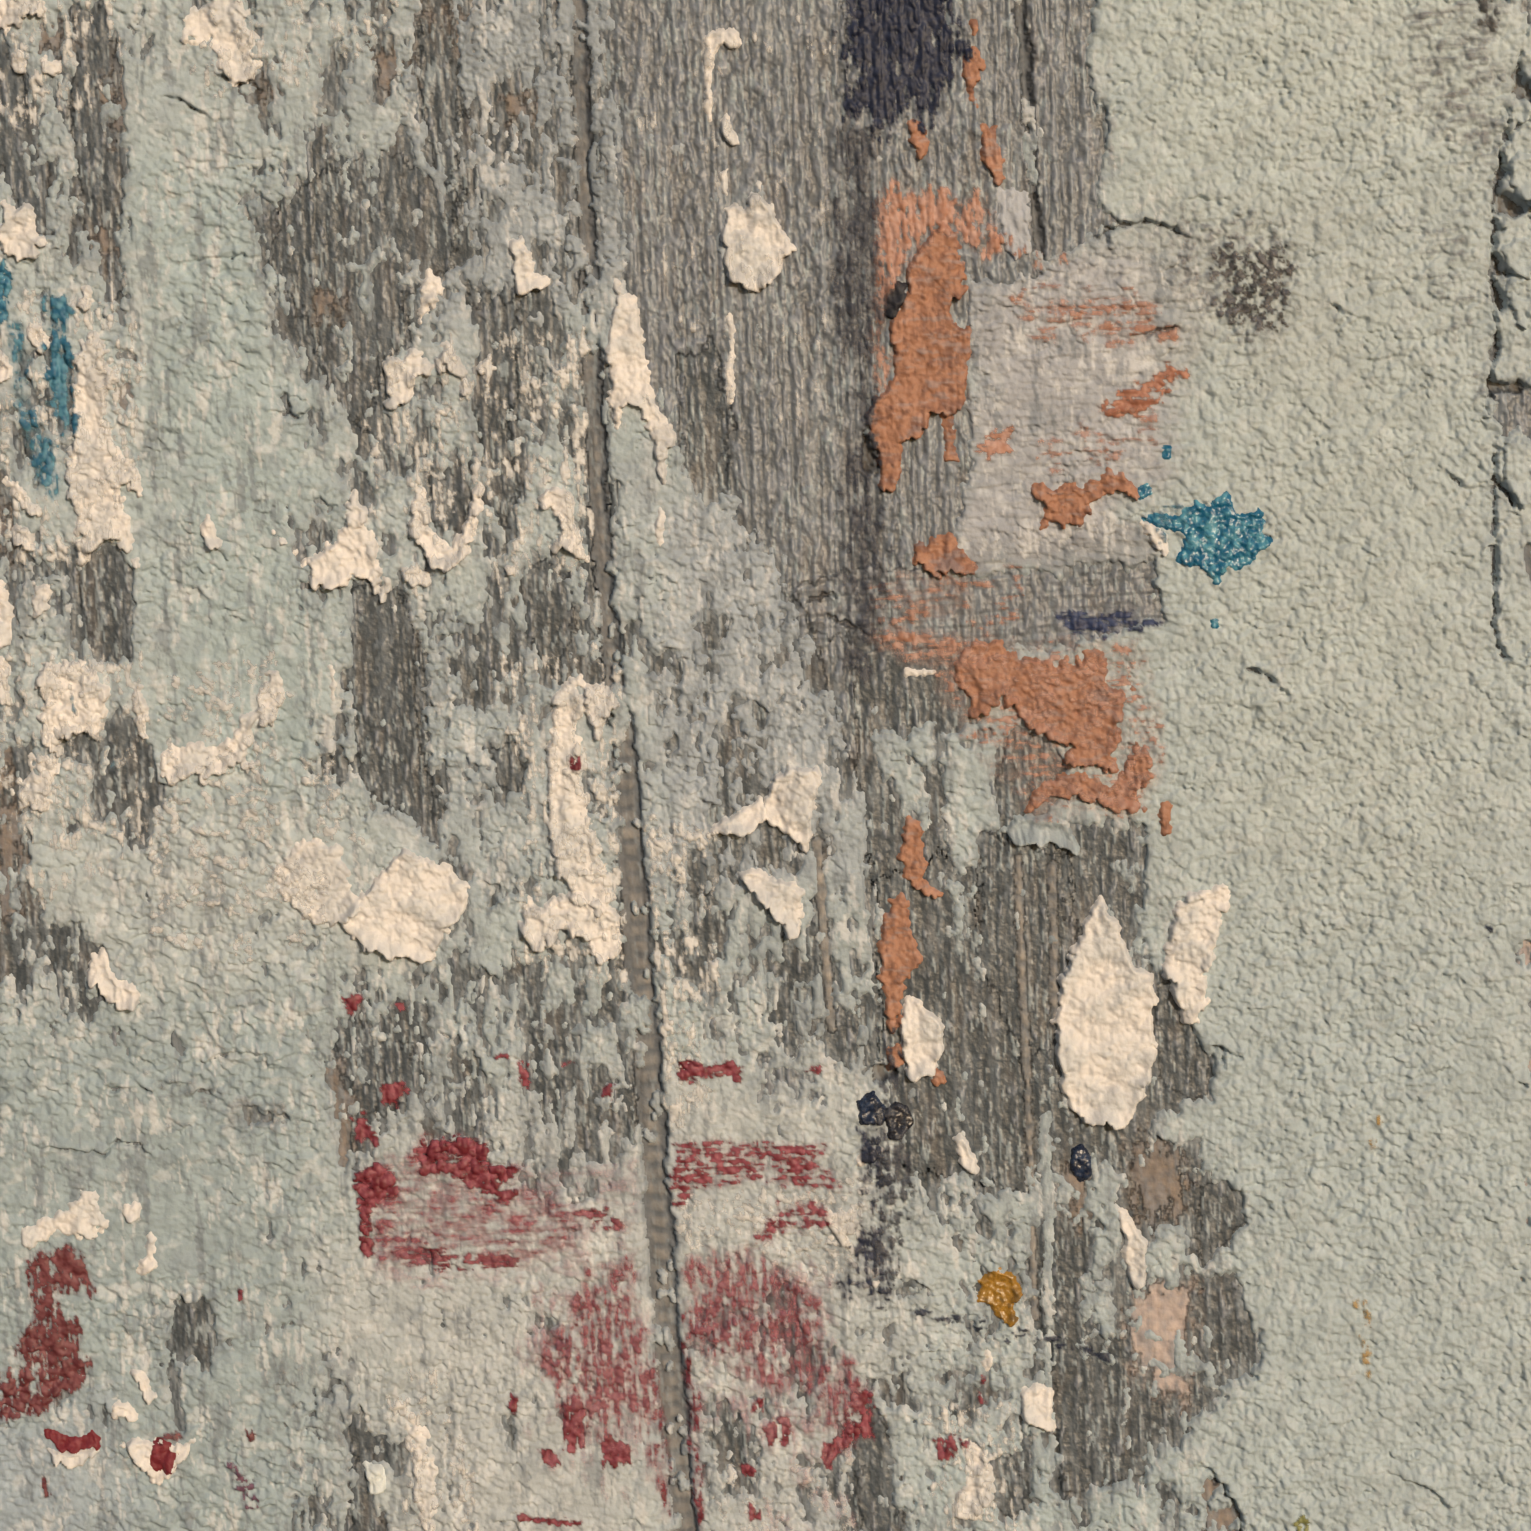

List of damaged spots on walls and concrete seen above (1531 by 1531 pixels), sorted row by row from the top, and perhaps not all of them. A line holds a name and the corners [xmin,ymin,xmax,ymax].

peeling [0,0,154,326]
peeling [991,97,1038,261]
crack [1093,219,1181,238]
spalling [1511,62,1531,103]
peeling [676,338,733,507]
spalling [1487,380,1524,394]
peeling [1496,425,1531,510]
peeling [237,0,663,1214]
peeling [0,661,105,1038]
peeling [60,705,164,851]
peeling [623,591,1261,1531]
peeling [287,1393,413,1531]